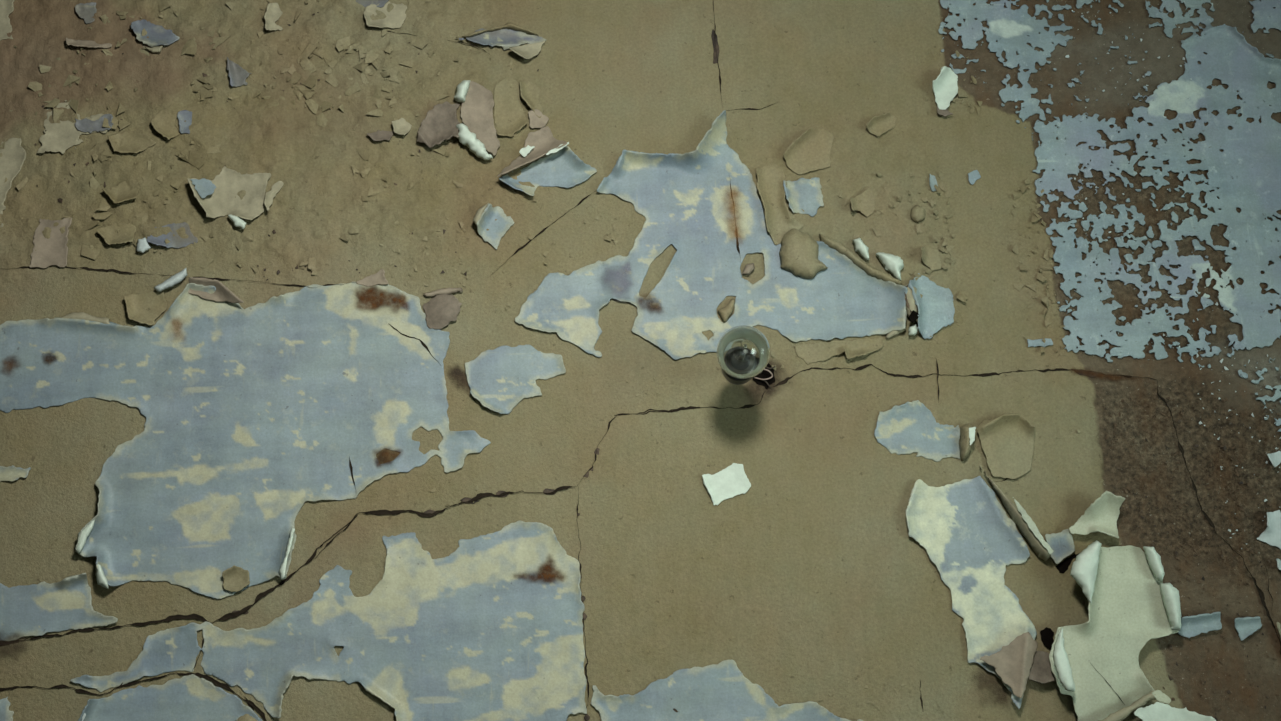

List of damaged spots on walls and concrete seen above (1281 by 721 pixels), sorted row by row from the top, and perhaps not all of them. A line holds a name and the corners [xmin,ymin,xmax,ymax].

crack [711,0,773,111]
rust [357,286,407,309]
peeling [0,0,955,642]
rust [728,191,740,237]
peeling [932,0,1281,570]
peeling [70,521,863,721]
rust [519,559,564,582]
crack [0,359,1281,721]